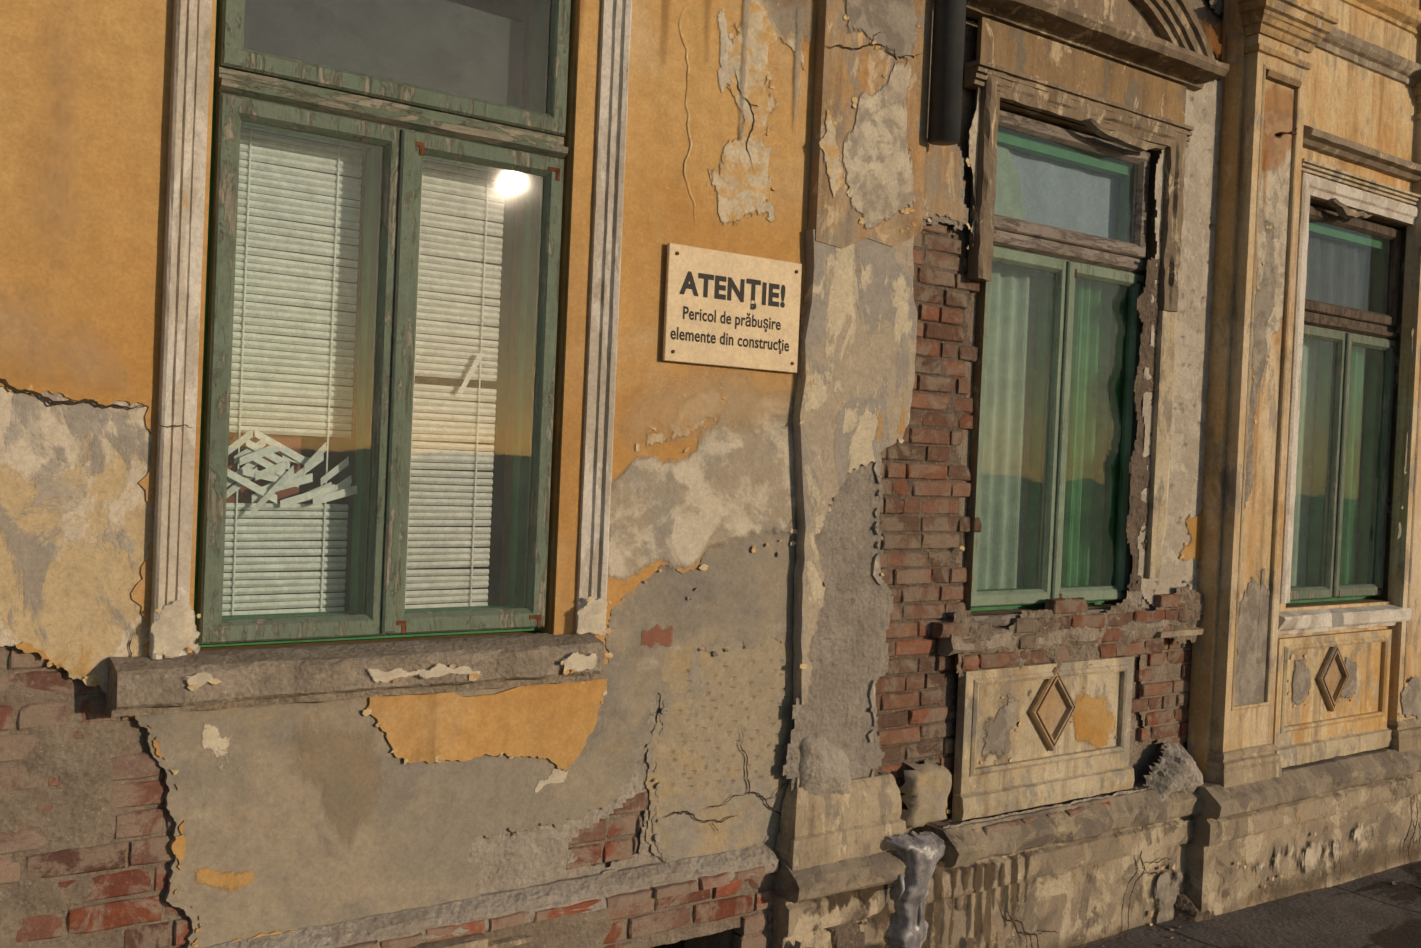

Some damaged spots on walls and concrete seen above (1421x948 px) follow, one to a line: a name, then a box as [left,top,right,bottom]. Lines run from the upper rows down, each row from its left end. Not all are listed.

peeling [707,0,806,226]
peeling [819,0,920,230]
crack [0,378,192,428]
peeling [0,79,1223,948]